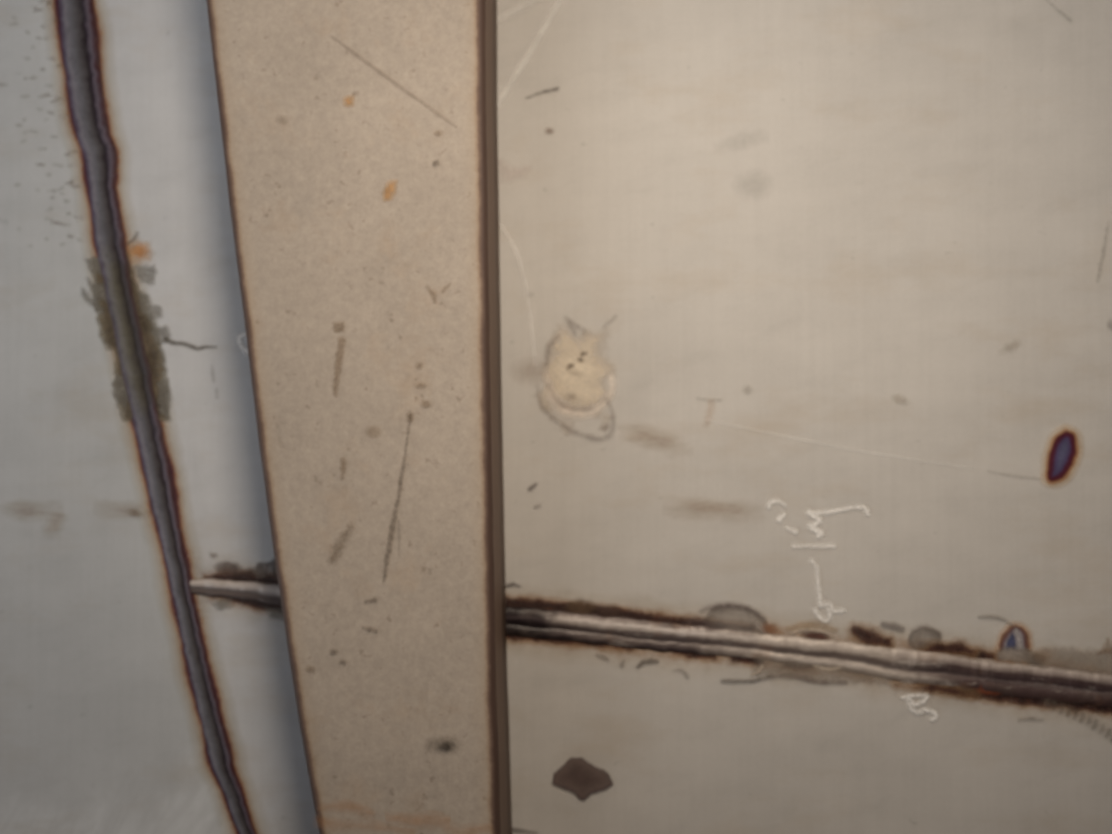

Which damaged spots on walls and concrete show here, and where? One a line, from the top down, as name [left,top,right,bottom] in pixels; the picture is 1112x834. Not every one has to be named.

water stain [83,258,133,421]
water stain [127,255,170,421]